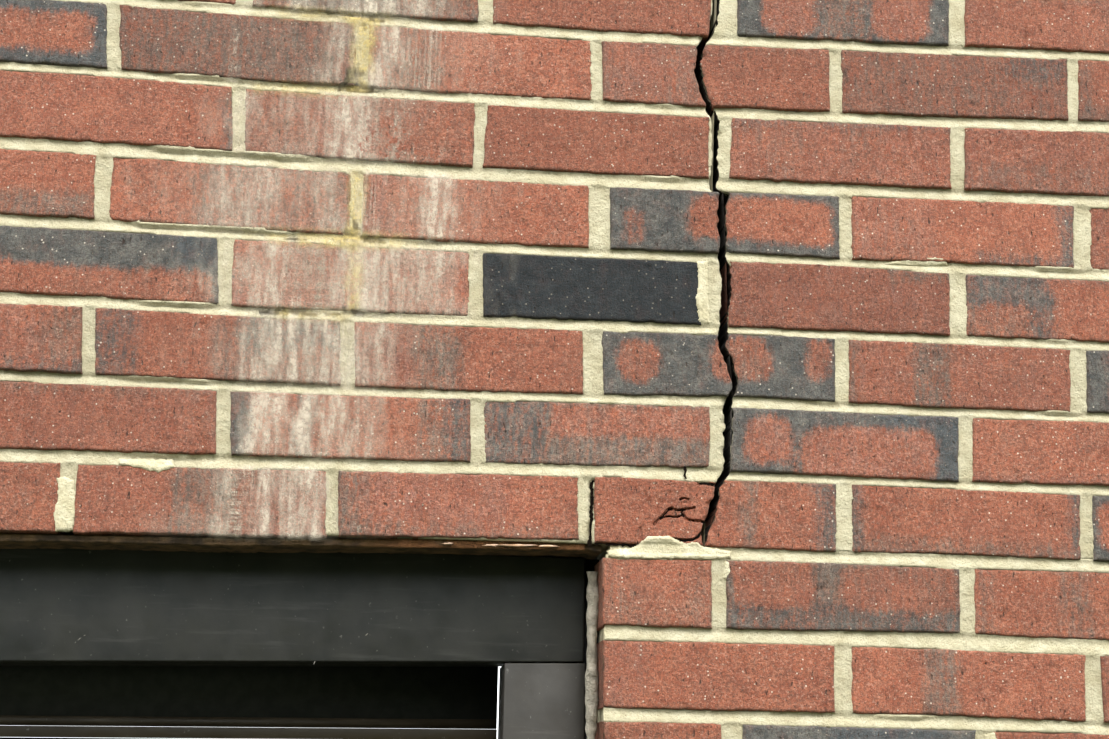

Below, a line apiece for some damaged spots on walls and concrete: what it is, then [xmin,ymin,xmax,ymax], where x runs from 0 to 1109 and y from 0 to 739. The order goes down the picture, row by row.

crack [659,0,737,542]